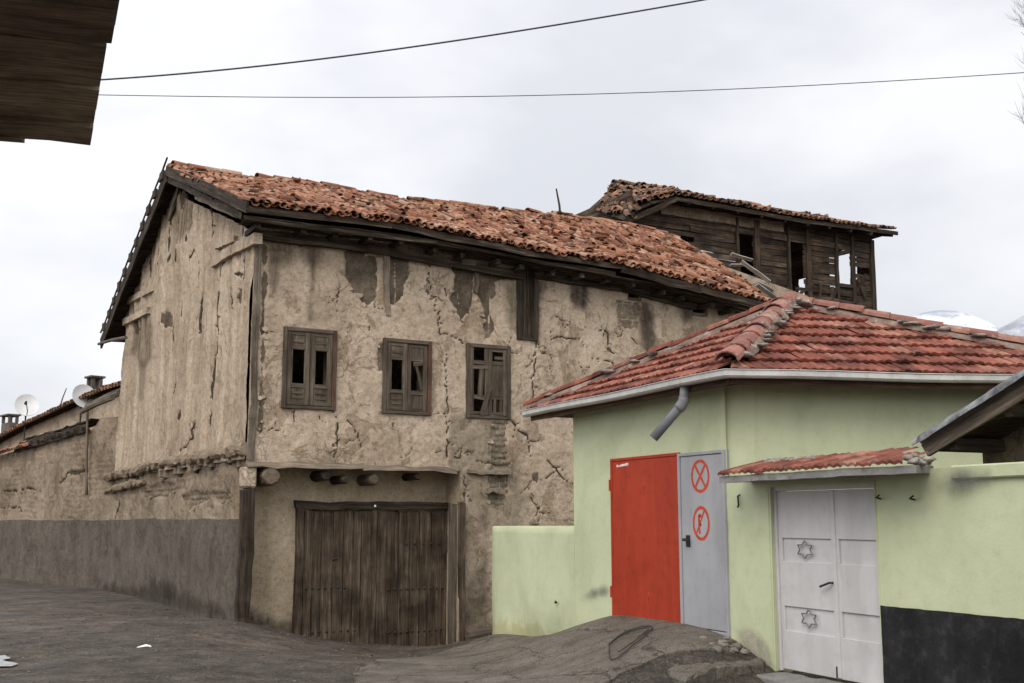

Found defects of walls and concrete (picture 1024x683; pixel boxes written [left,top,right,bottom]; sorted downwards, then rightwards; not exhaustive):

crack [149,201,245,451]
peeling [344,251,377,307]
peeling [388,257,414,305]
peeling [449,267,512,338]
crack [426,266,573,521]
peeling [486,420,510,510]